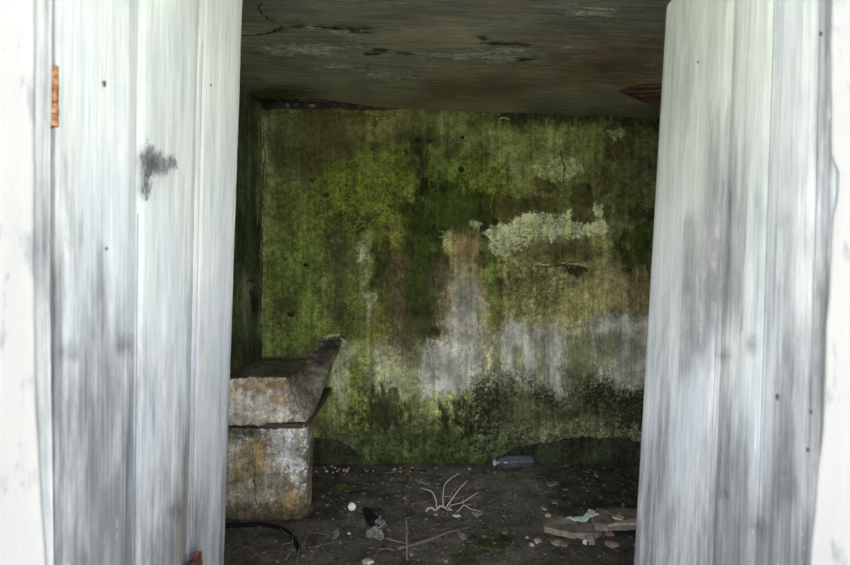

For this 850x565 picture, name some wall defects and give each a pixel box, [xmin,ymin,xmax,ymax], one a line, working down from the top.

crack [246,4,284,36]
damp [496,112,660,130]
damp [332,136,557,333]
damp [513,237,604,278]
damp [569,141,655,279]
damp [312,362,645,465]